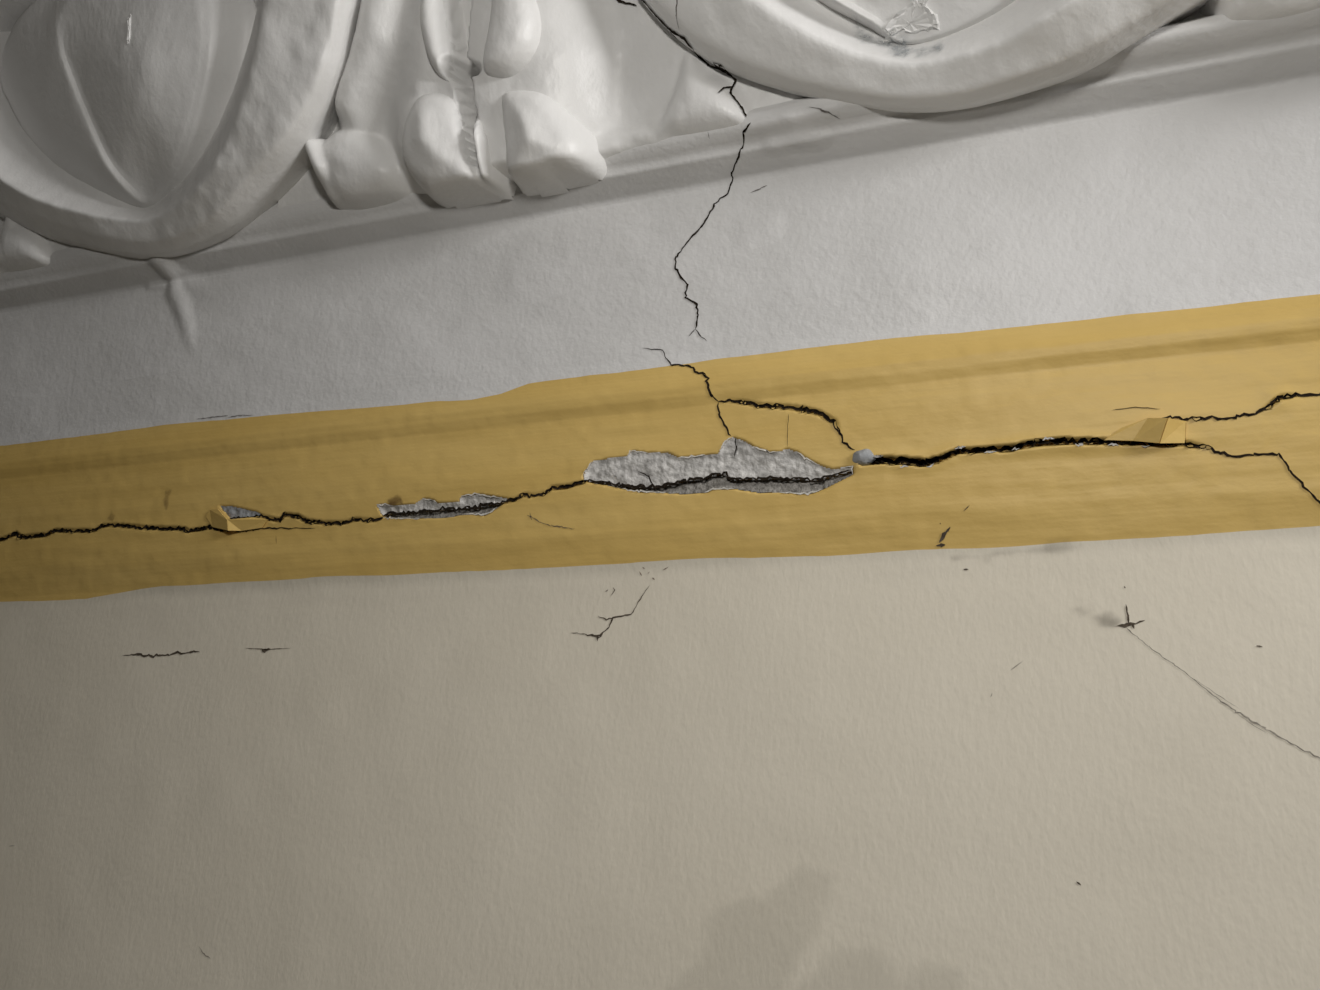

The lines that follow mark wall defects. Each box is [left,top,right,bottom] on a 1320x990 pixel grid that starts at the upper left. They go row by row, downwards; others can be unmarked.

peeling [882,0,940,55]
crack [617,0,1320,504]
flaking render [583,437,853,495]
crack [0,512,383,541]
flaking render [377,493,508,519]
crack [506,480,587,529]